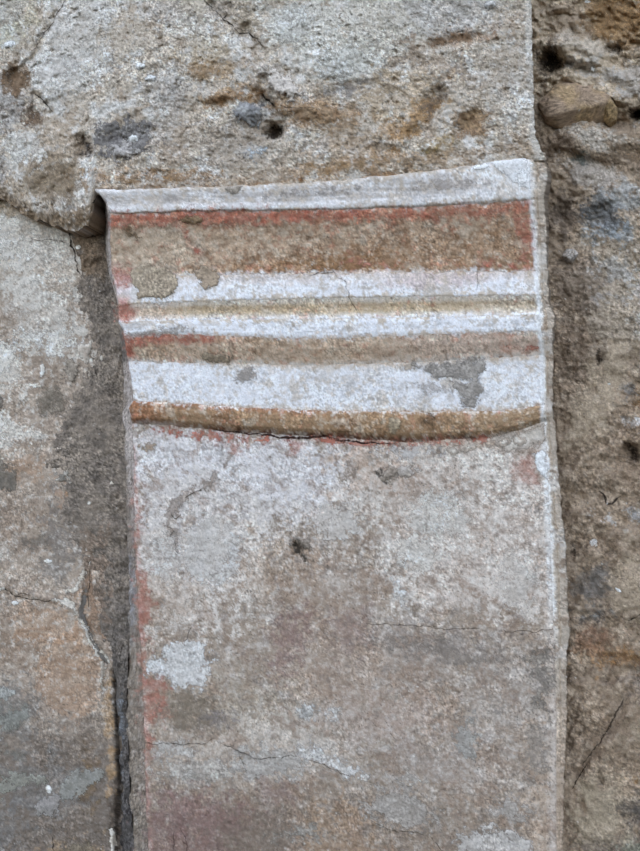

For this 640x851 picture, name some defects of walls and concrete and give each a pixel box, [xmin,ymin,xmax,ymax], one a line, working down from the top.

crack [4,556,110,694]